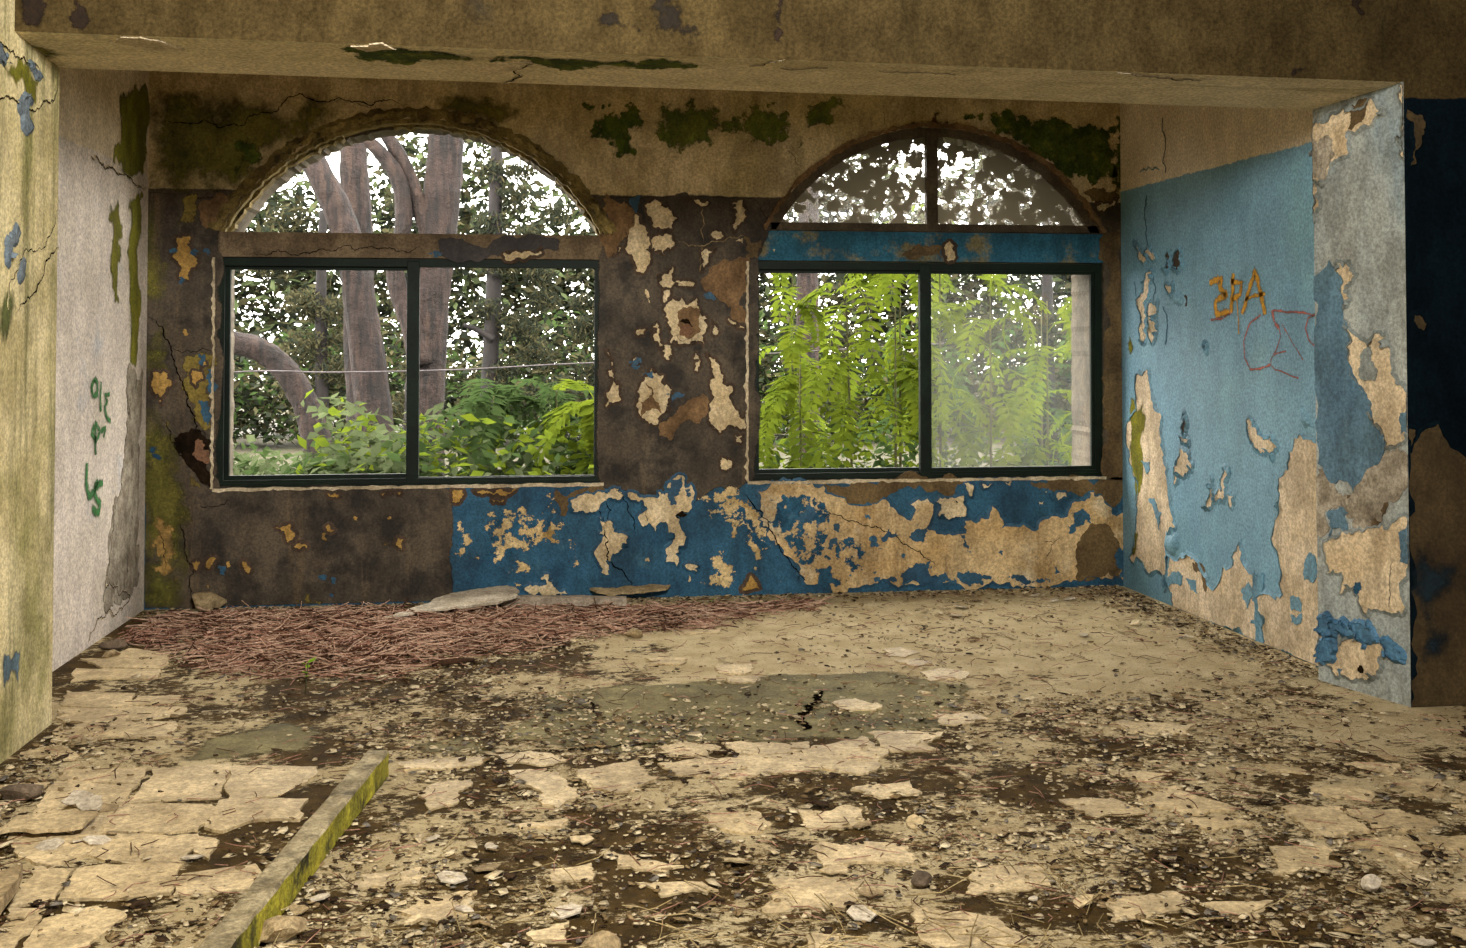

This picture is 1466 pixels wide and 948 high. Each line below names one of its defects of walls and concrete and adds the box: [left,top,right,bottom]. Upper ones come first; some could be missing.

leakage [600,0,697,35]
crack [0,40,58,112]
crack [91,154,146,190]
peeling [1308,82,1430,224]
crack [7,200,59,314]
peeling [169,192,228,285]
peeling [103,352,255,614]
peeling [449,187,1466,707]